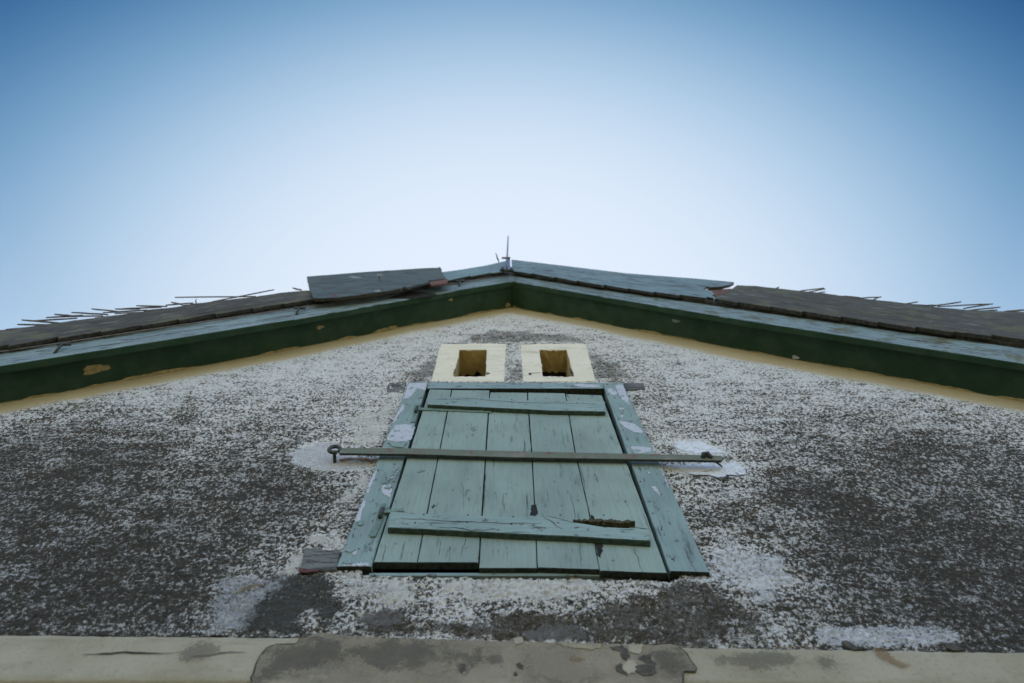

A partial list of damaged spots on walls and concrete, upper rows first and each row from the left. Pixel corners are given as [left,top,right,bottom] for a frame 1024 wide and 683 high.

peeling [83,364,111,375]
peeling [387,383,427,448]
peeling [355,466,398,526]
peeling [343,549,369,567]
water stain [240,573,347,635]
peeling [250,607,697,683]